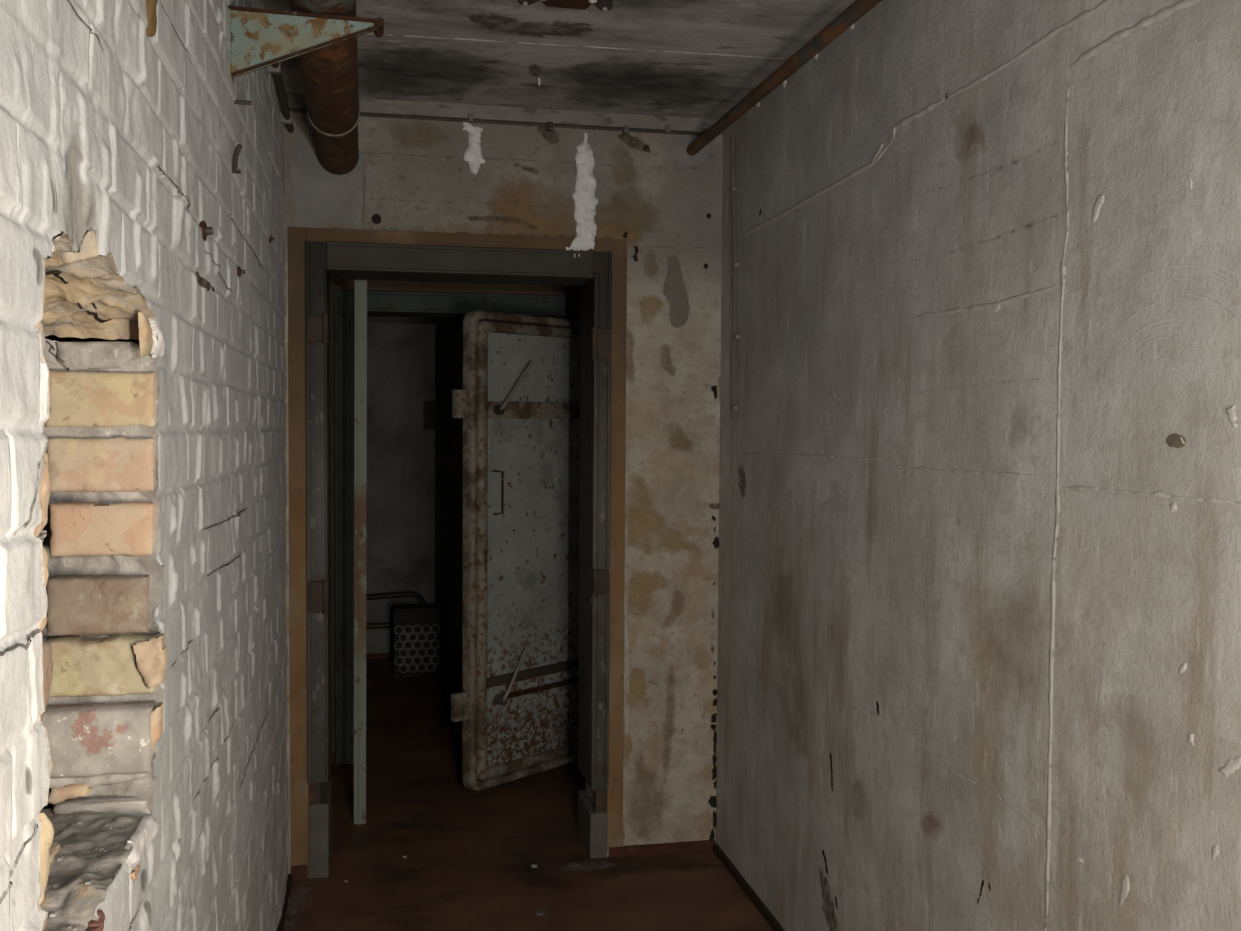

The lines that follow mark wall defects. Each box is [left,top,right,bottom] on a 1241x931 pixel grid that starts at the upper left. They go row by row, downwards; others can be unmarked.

crack [68,0,103,50]
leakage [572,64,705,110]
leakage [463,122,485,175]
leakage [566,132,609,258]
leakage [640,256,689,327]
spalling [32,144,168,931]